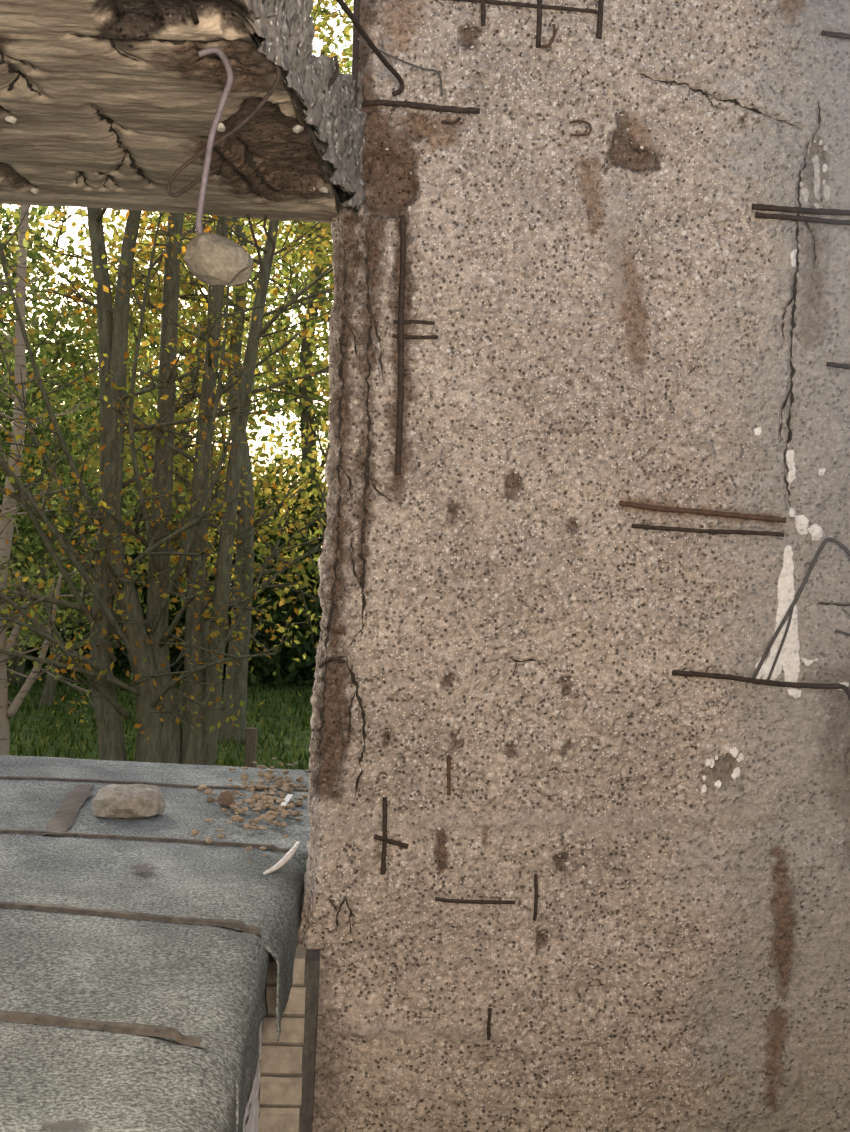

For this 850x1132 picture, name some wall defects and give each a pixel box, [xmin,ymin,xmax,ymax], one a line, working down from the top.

spalling [217,97,328,193]
crack [640,73,821,516]
crack [317,230,390,797]
spalling [672,670,850,701]
rust [772,847,795,988]
rust [766,1011,786,1109]